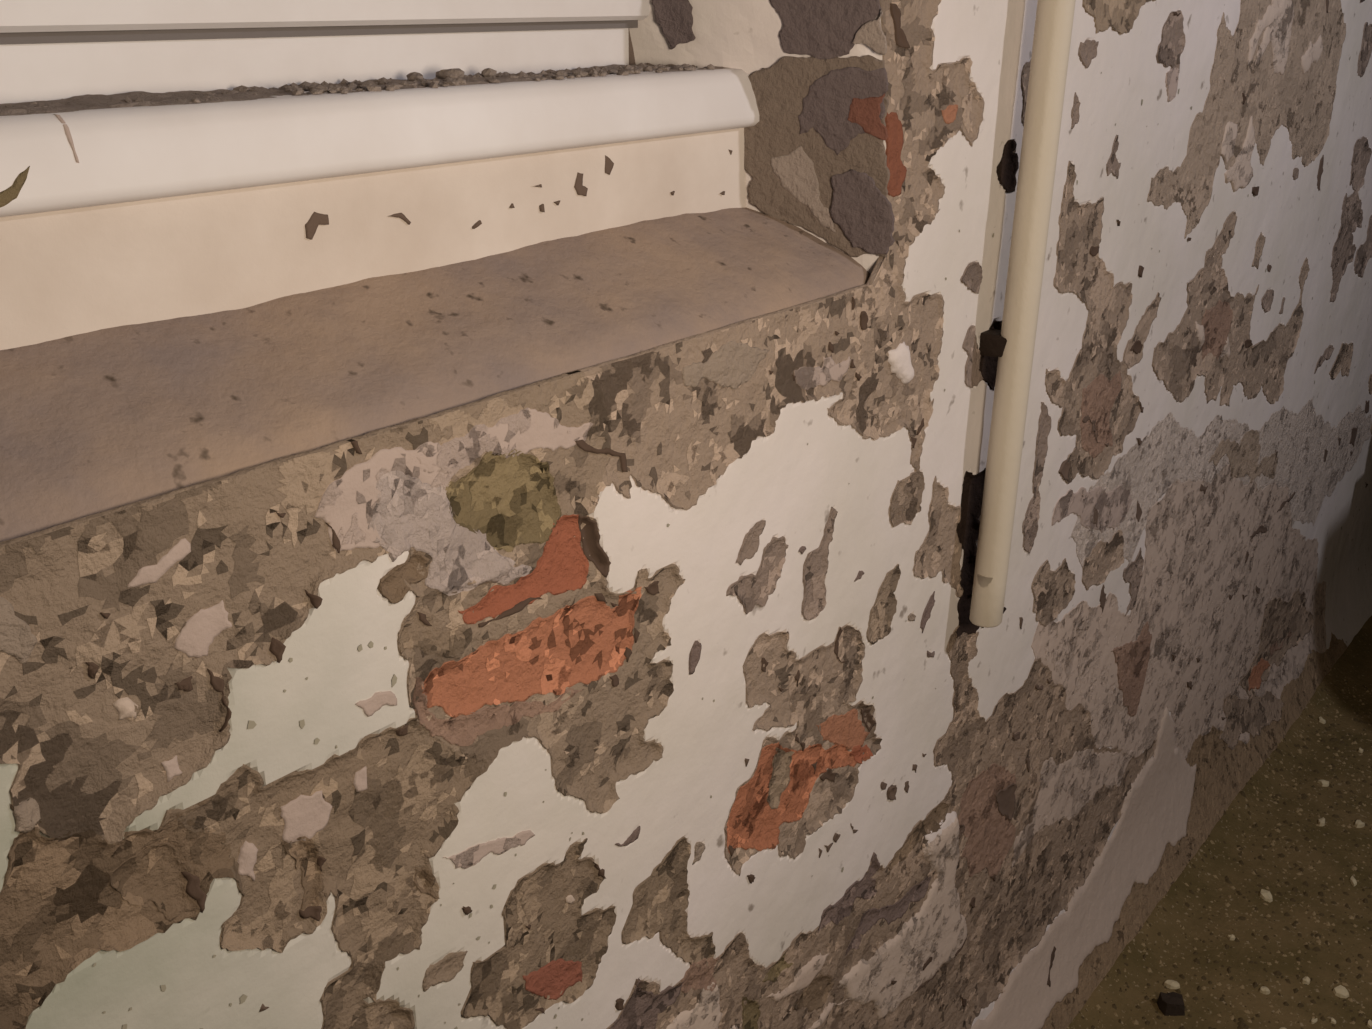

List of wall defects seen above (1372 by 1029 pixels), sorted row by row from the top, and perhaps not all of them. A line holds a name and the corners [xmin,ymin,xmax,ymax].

spalling [1078,0,1156,68]
peeling [1156,10,1185,102]
peeling [1357,22,1372,77]
peeling [1071,92,1081,129]
peeling [1106,135,1121,179]
spalling [1330,137,1372,302]
spalling [1022,161,1310,553]
peeling [1324,374,1372,462]
spalling [0,0,985,1029]
spalling [1019,508,1144,629]
spalling [422,625,1157,1029]
peeling [1164,980,1180,989]